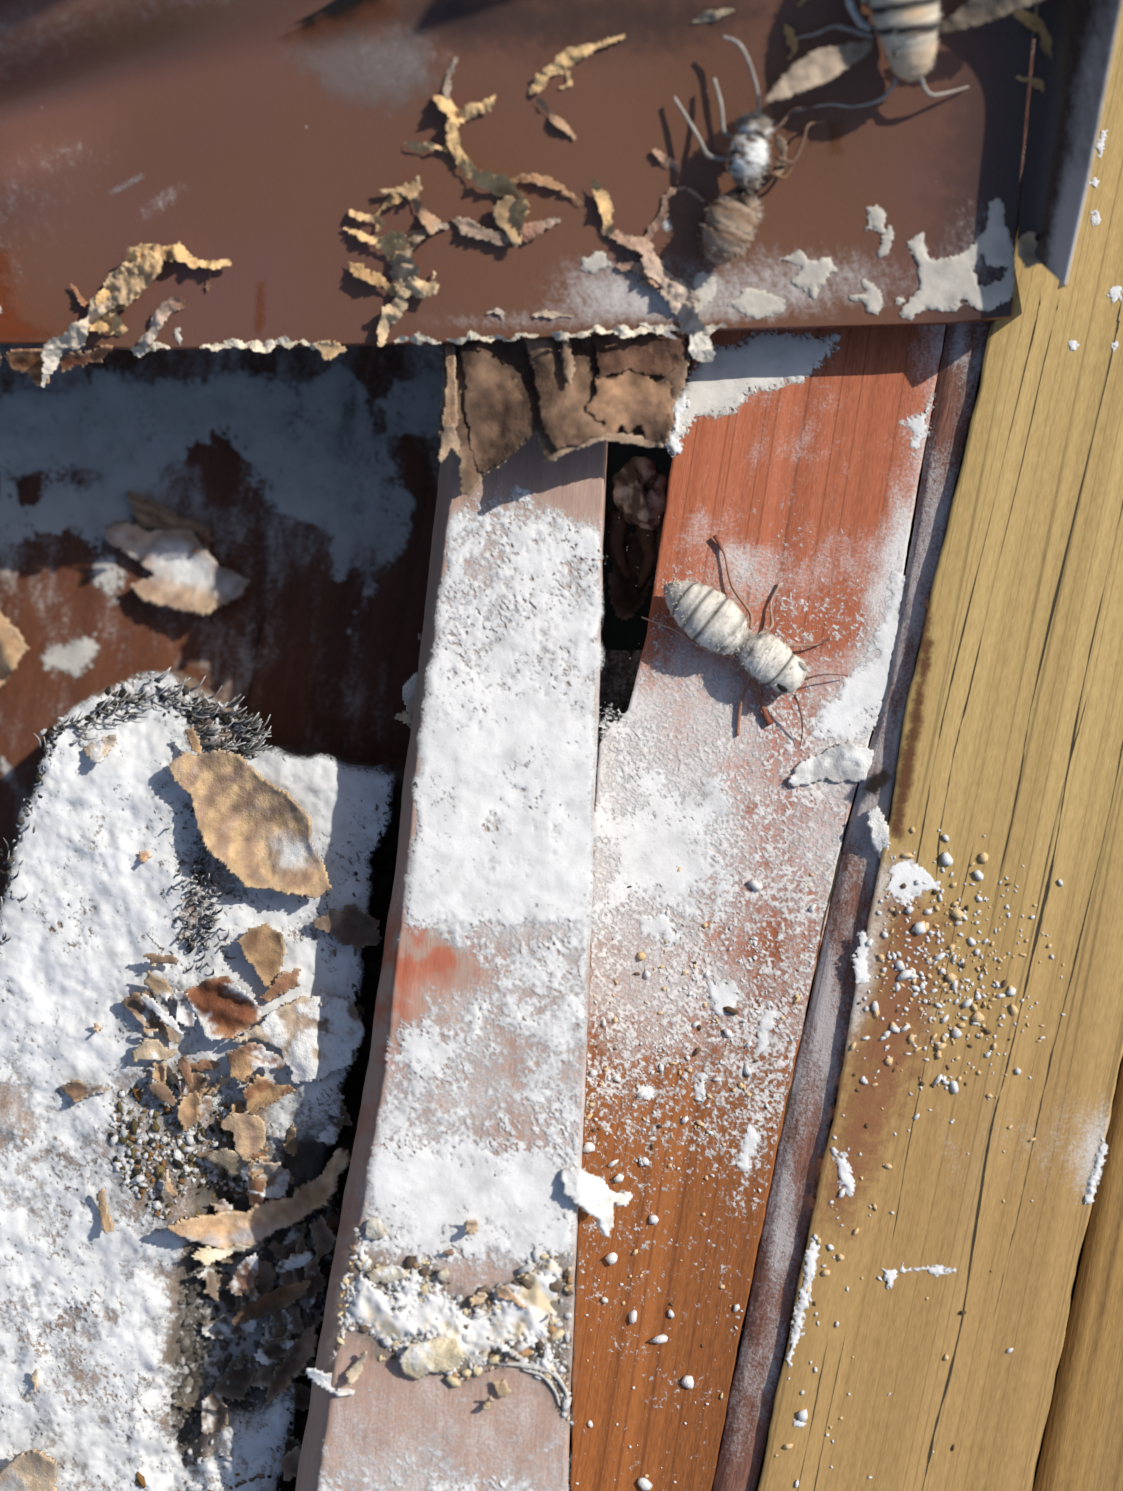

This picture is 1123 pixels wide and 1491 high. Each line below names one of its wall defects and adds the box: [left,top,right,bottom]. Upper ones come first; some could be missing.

rust [297,0,389,40]
rust [0,254,39,338]
peeling [580,251,612,274]
peeling [692,249,838,320]
peeling [849,198,1015,321]
peeling [312,340,347,361]
leakage [106,1076,248,1220]